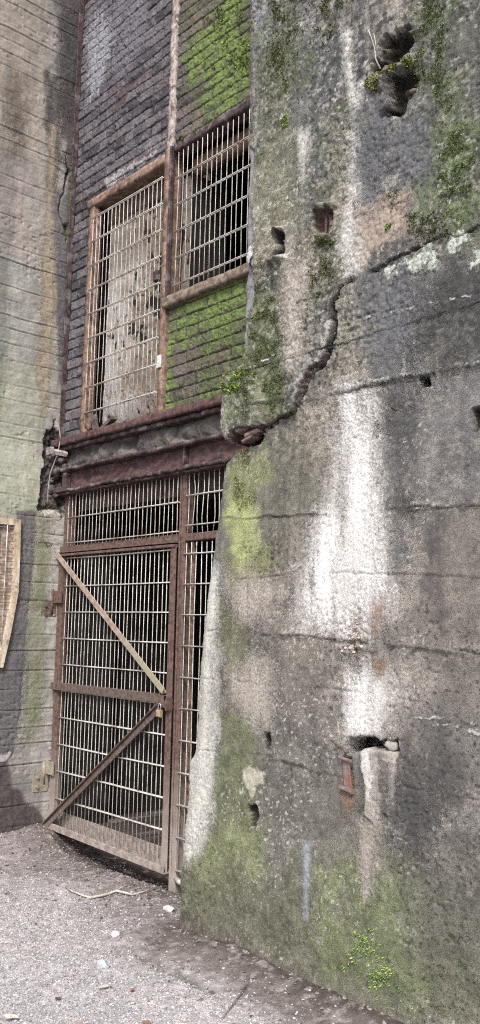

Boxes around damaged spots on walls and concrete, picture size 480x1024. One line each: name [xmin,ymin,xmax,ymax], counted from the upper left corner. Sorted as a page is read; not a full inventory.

crack [239,227,480,452]
water stain [299,28,430,642]
spalling [34,427,68,536]
spalling [234,427,265,446]
water stain [344,668,394,801]
peeling [361,745,400,824]
efflorescence [359,818,381,899]